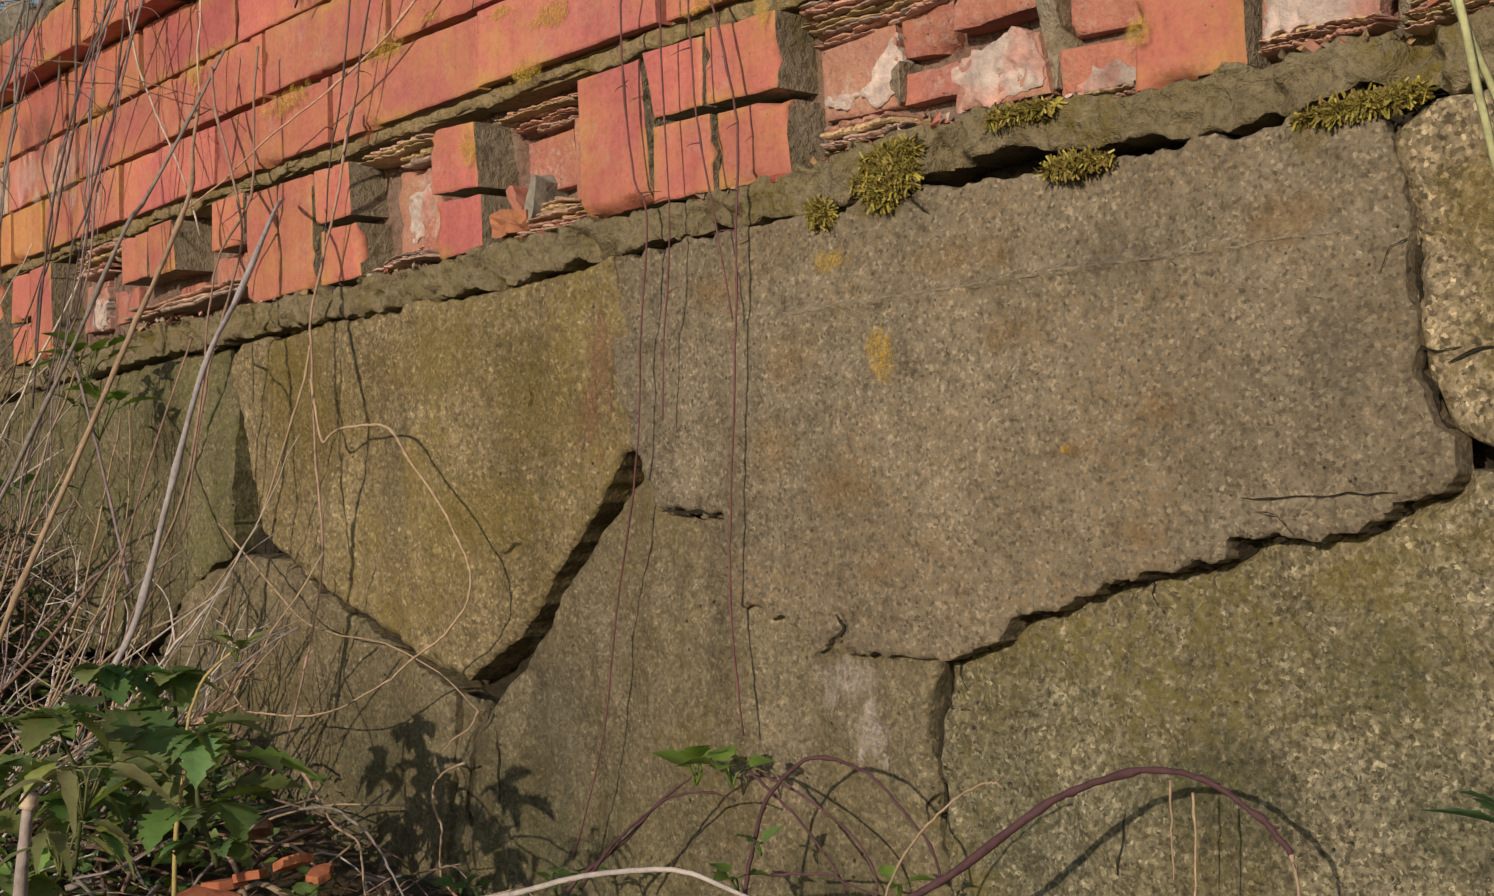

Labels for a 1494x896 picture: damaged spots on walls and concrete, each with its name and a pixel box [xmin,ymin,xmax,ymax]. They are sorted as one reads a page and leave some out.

damp [1262,0,1394,40]
spalling [1257,0,1494,63]
damp [825,32,913,111]
damp [951,26,1051,114]
damp [1076,58,1136,95]
spalling [494,93,579,140]
spalling [358,133,434,170]
spalling [514,196,601,238]
crack [1380,237,1424,303]
crack [641,476,718,520]
crack [1020,345,1494,626]
crack [926,646,992,822]